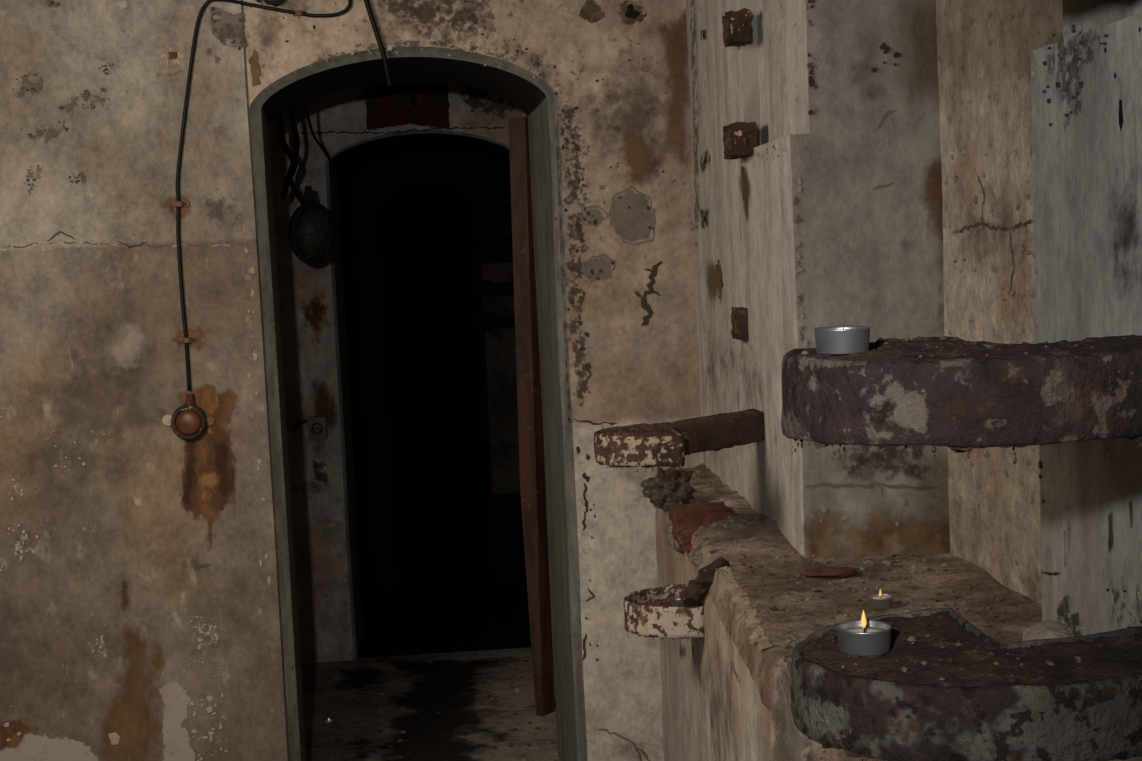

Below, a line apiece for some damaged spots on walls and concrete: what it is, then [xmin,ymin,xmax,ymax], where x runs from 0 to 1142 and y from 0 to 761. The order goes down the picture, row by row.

water stain [628,15,688,160]
water stain [596,92,664,181]
flaking render [555,101,656,423]
crack [635,261,662,326]
crack [953,176,1034,294]
rust [178,385,236,547]
water stain [807,506,950,577]
peeling [0,720,99,761]
peeling [108,732,120,745]
peeling [158,682,229,761]